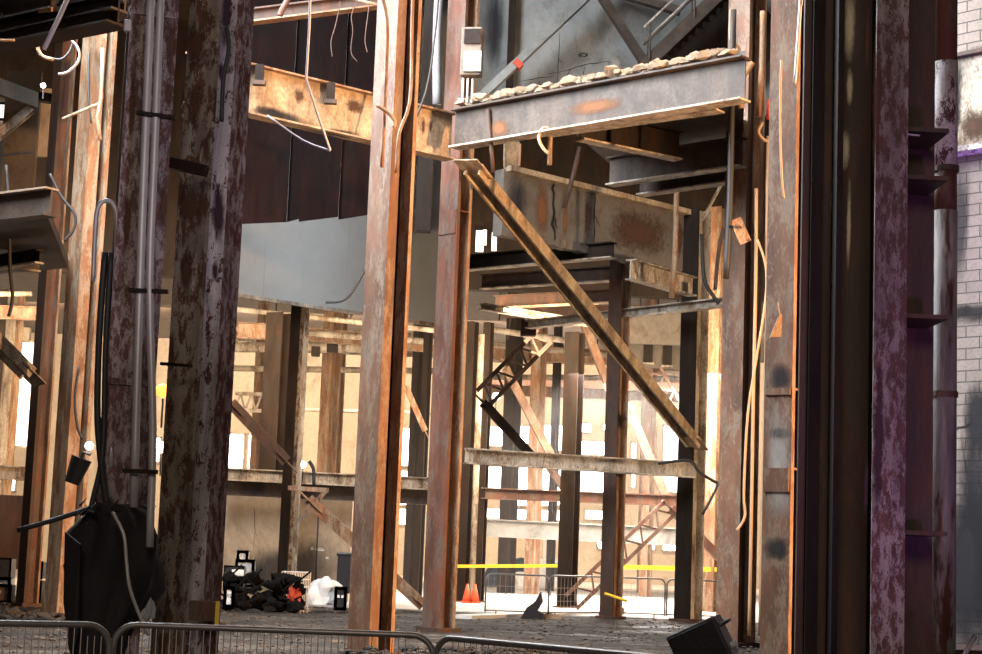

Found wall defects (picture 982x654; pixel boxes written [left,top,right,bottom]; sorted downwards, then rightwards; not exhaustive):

corrosion [349,101,362,112]
corrosion [577,100,615,113]
corrosion [866,18,891,165]
corrosion [492,121,506,134]
corrosion [613,212,663,251]
corrosion [181,255,191,290]